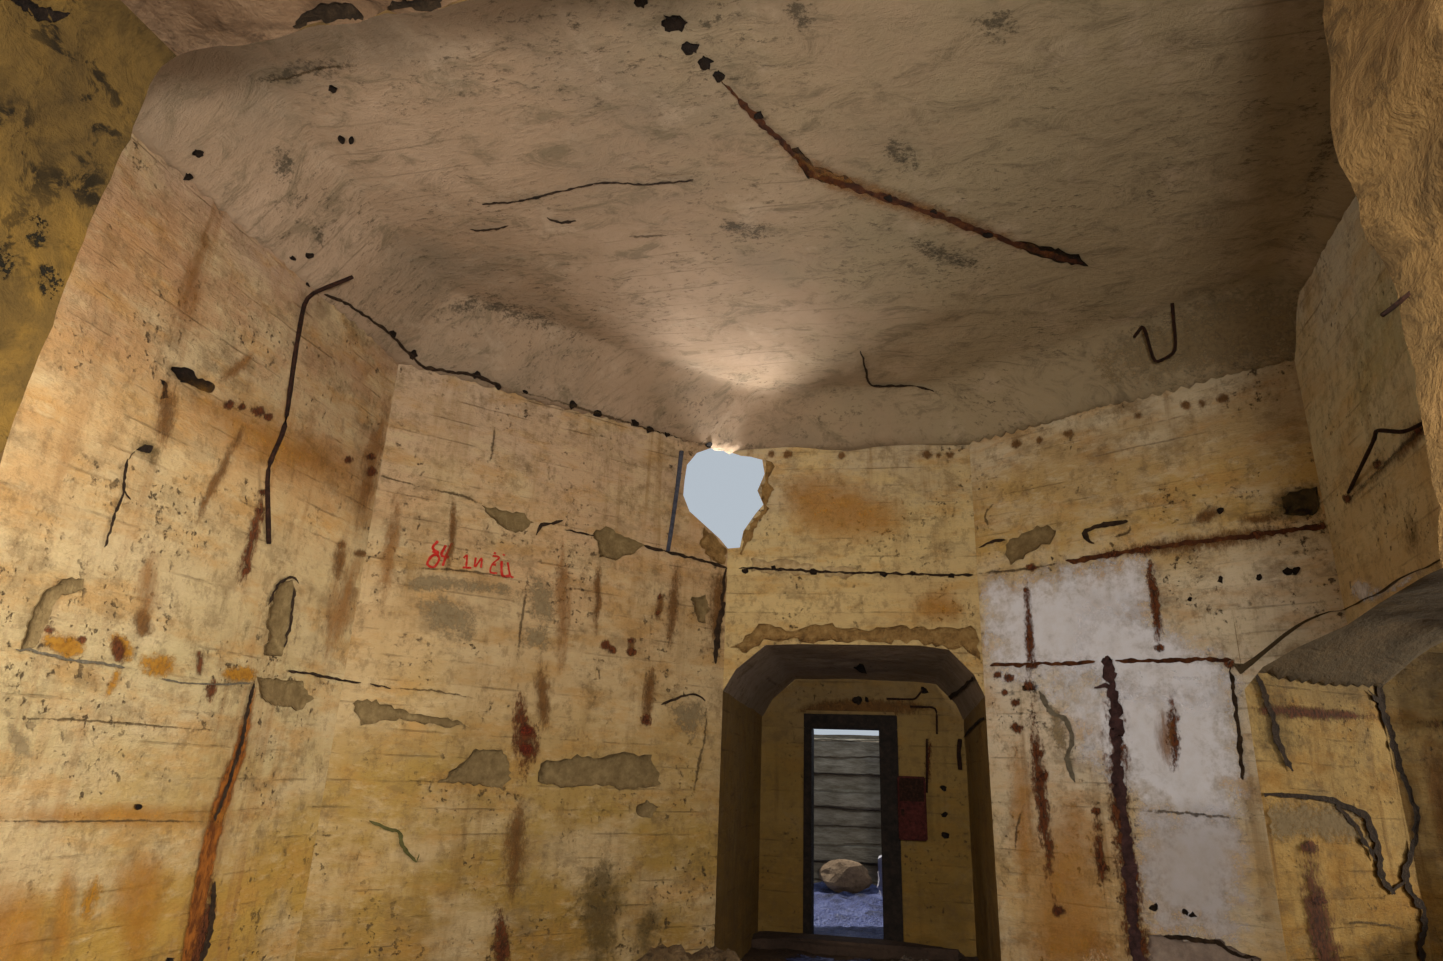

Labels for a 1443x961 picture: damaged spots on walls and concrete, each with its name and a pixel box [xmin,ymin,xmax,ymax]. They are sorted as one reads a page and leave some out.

crack [634,0,1088,266]
crack [324,294,713,448]
peeling [20,577,84,652]
peeling [264,576,299,656]
corrosion [1023,587,1035,662]
peeling [257,677,314,711]
peeling [353,699,469,728]
corrosion [512,670,551,780]
peeling [538,752,661,818]
corrosion [994,672,1054,878]
corrosion [1091,807,1108,882]
crack [1368,686,1428,961]